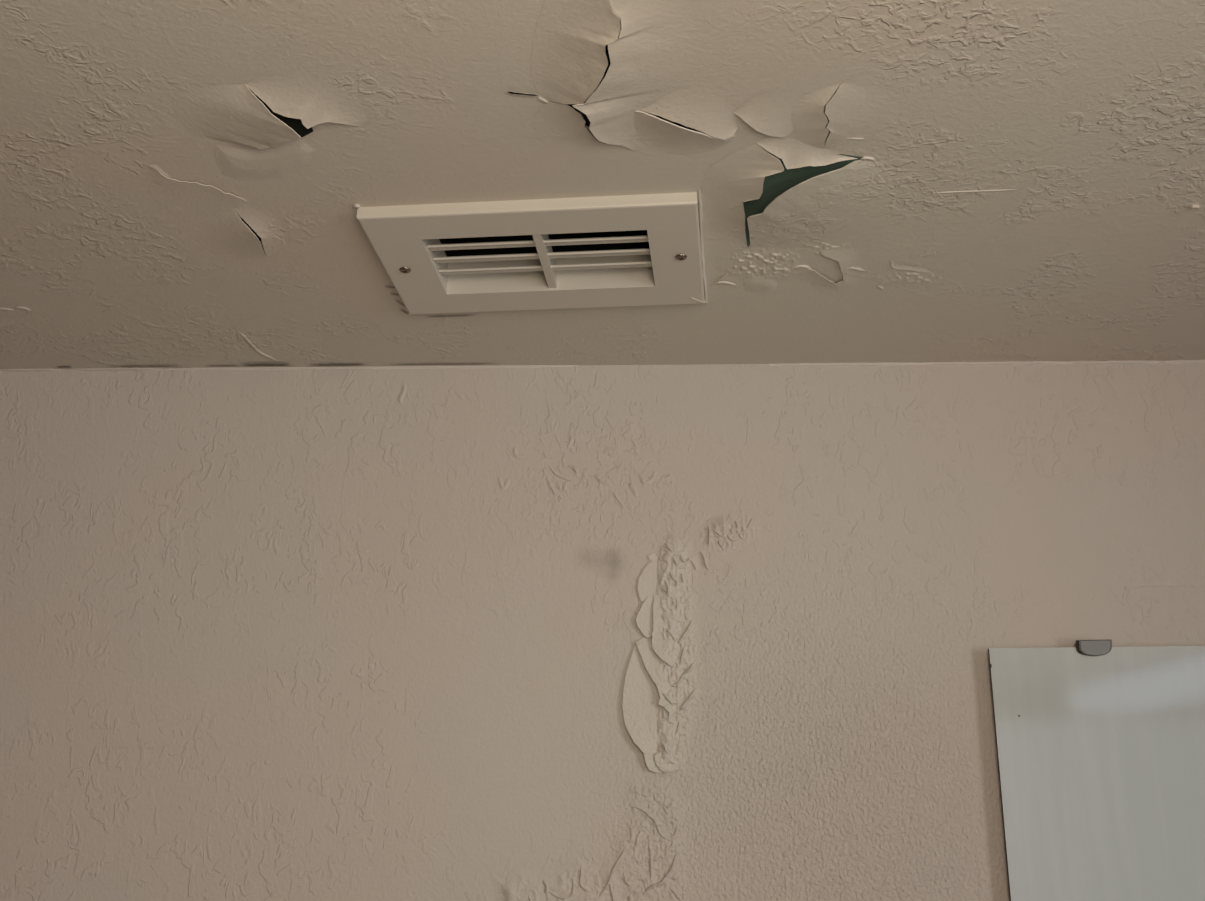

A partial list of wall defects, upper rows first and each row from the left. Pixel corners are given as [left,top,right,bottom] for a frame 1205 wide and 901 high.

peeling [147,164,288,260]
peeling [173,71,371,181]
peeling [531,0,947,296]
peeling [616,531,710,780]